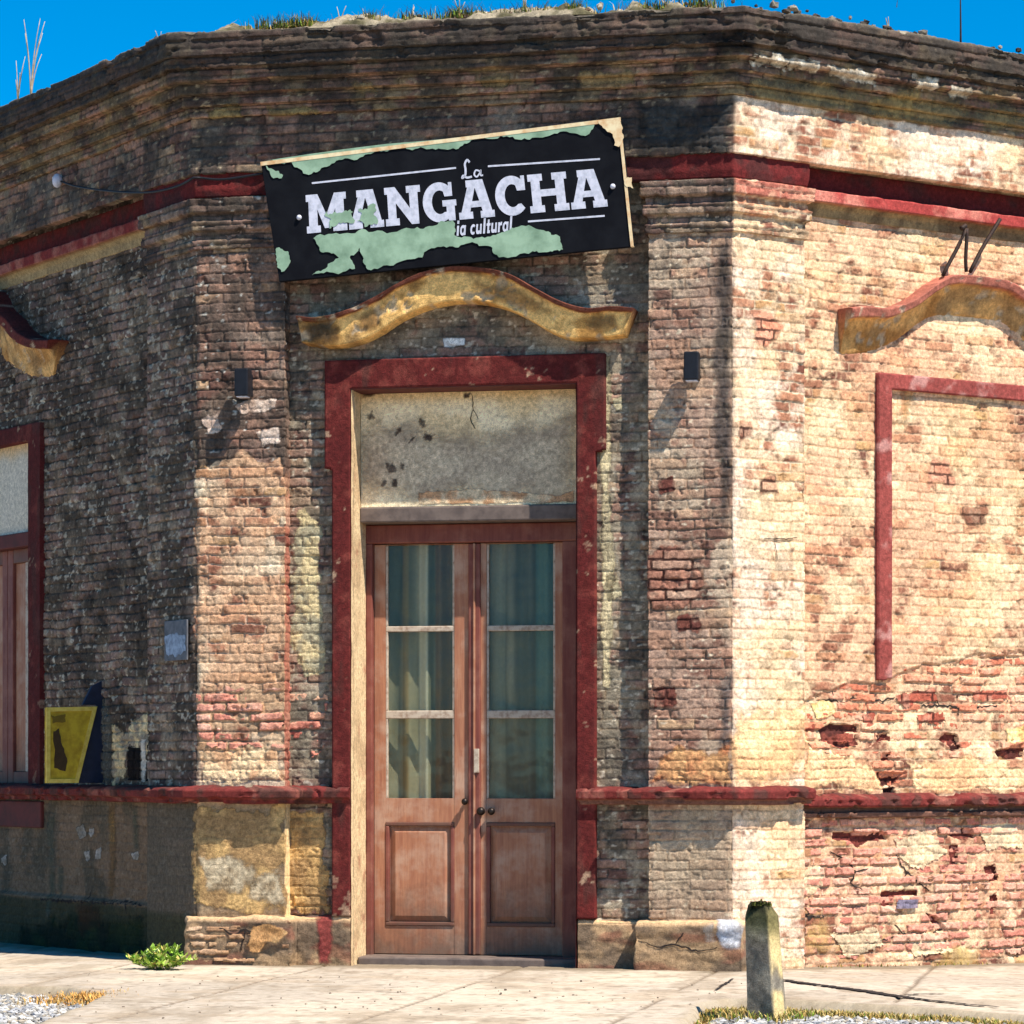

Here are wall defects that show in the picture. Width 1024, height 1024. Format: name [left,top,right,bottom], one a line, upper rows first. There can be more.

spalling [748,53,877,87]
spalling [912,73,972,99]
flaking render [658,475,675,494]
flaking render [647,545,706,634]
spalling [651,650,1024,794]
peeling [76,824,102,862]
peeling [191,804,330,952]
crack [830,851,868,890]
crack [896,854,932,891]
crack [638,933,717,952]